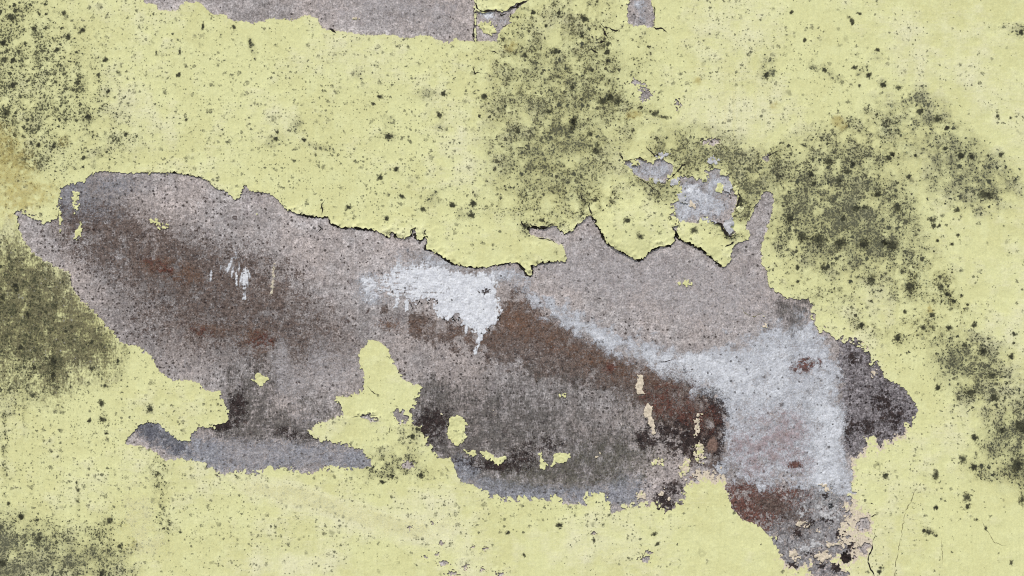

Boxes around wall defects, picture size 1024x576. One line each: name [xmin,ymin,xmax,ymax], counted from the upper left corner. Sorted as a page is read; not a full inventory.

damp [0,0,138,219]
peeling [144,0,527,45]
peeling [626,0,655,28]
damp [0,234,130,479]
peeling [14,137,918,576]
damp [137,251,857,541]
corrosion [408,286,822,534]
damp [478,0,1024,503]